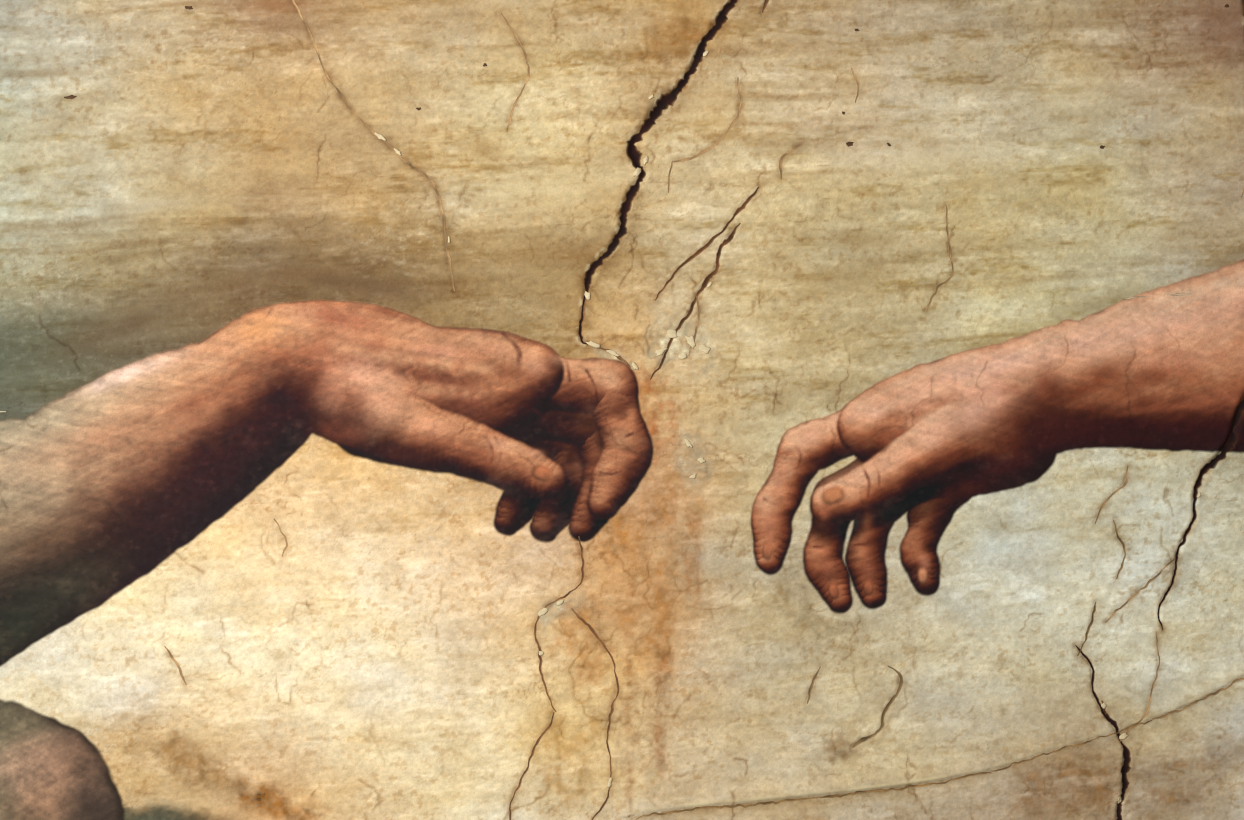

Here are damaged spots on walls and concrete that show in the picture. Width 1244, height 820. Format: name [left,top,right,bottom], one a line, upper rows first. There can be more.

crack [292,0,455,291]
crack [578,0,805,380]
crack [925,205,954,312]
crack [509,536,619,820]
crack [807,666,821,704]
crack [852,666,903,748]
crack [1075,398,1244,820]